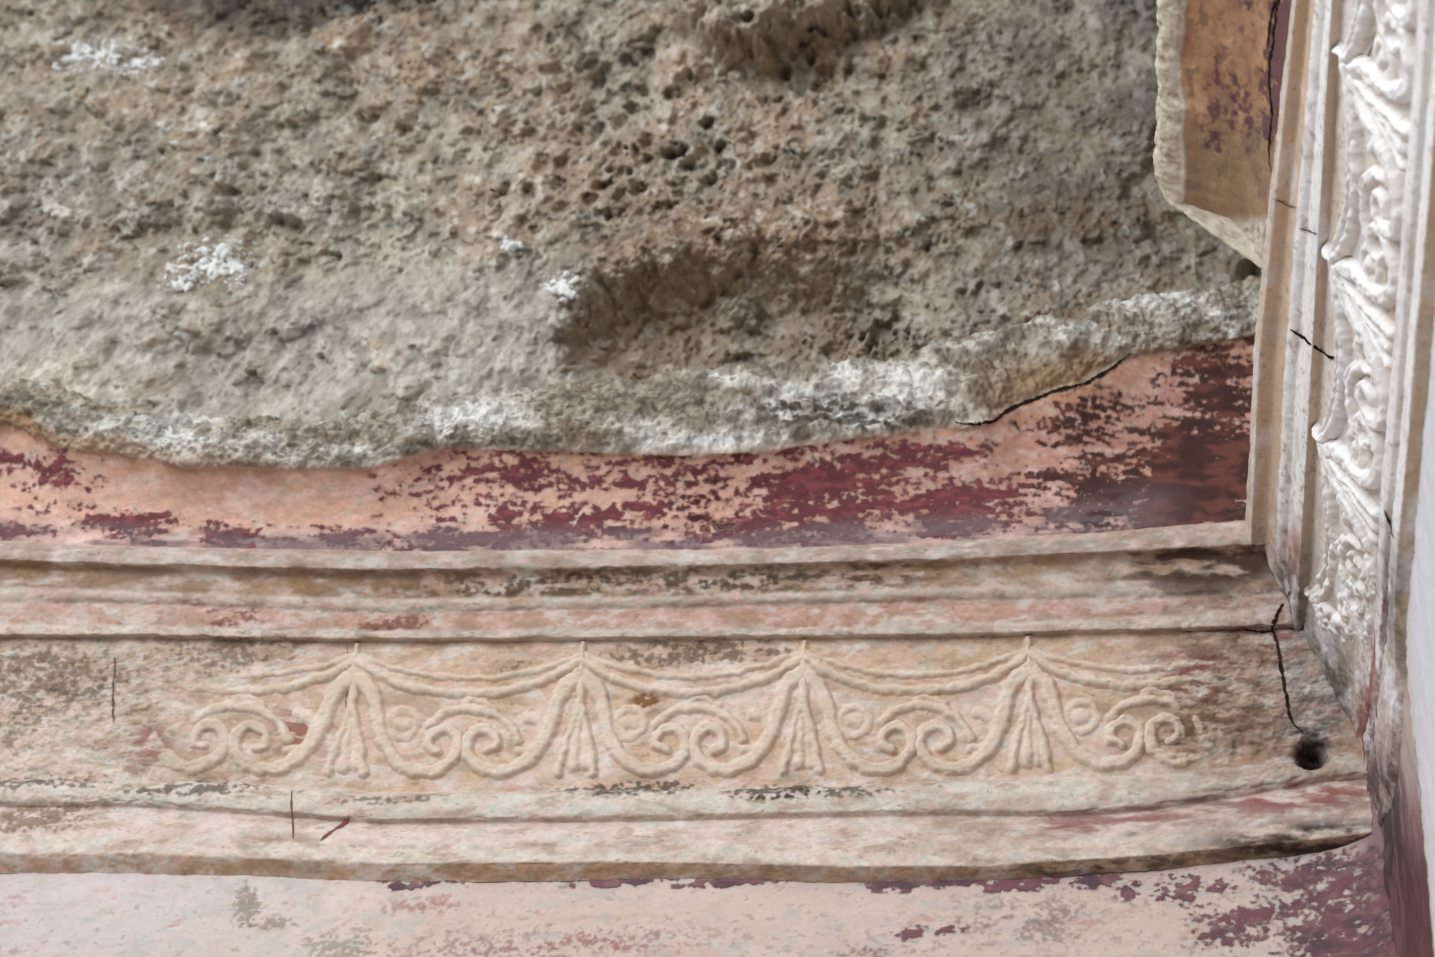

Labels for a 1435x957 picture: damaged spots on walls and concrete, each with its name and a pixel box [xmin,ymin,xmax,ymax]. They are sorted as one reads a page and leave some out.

peeling [1200,0,1292,153]
crack [1267,0,1317,235]
flaking render [0,0,1263,551]
crack [955,353,1132,426]
crack [1243,591,1303,733]
peeling [376,880,464,891]
peeling [564,878,788,888]
peeling [864,846,1398,957]